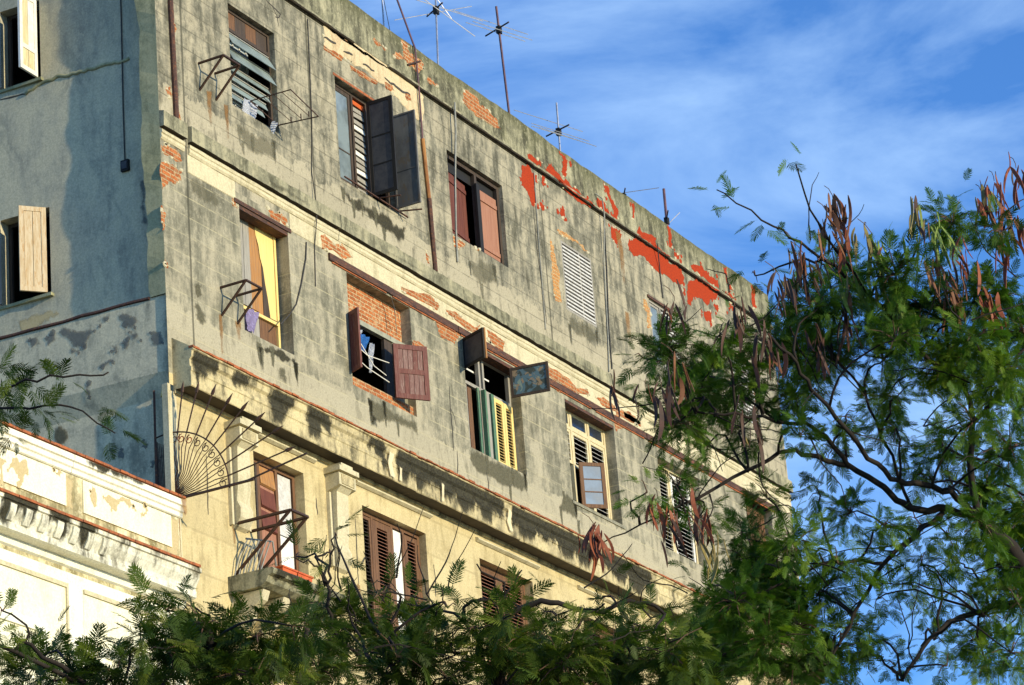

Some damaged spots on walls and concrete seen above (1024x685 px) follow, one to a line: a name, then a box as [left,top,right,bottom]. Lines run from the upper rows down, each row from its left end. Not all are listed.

spalling [322,26,439,121]
spalling [462,89,501,129]
spalling [160,142,183,189]
damp [341,186,405,241]
peeling [520,151,736,329]
damp [191,351,219,381]
damp [232,371,249,387]
damp [257,342,298,423]
damp [306,407,330,438]
peeling [0,457,29,488]
peeling [89,486,148,516]
damp [356,398,651,594]